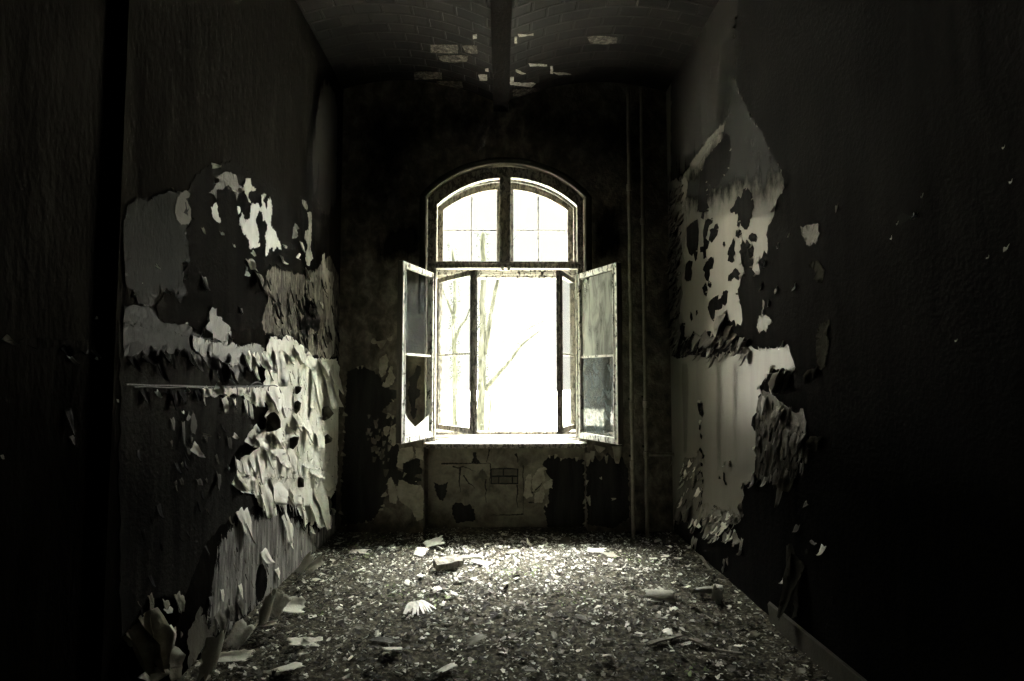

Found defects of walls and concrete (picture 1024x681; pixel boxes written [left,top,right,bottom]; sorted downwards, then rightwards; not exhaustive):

spalling [414,34,478,88]
peeling [510,63,571,97]
spalling [587,36,618,45]
flaking render [664,0,1024,681]
flaking render [117,161,475,681]
flaking render [471,445,630,545]